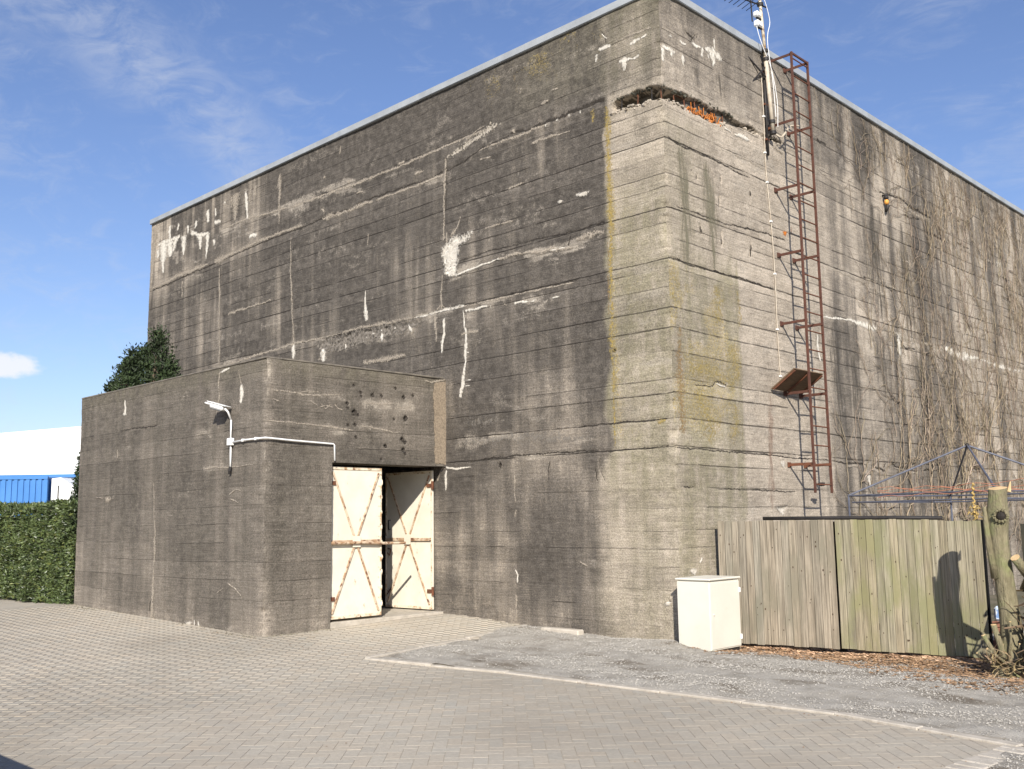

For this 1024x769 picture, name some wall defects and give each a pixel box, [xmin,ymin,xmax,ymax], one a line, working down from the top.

spalling [610,82,783,154]
efflorescence [150,185,257,284]
damp [592,107,616,444]
efflorescence [459,312,478,397]
damp [817,335,860,441]
damp [877,227,915,433]